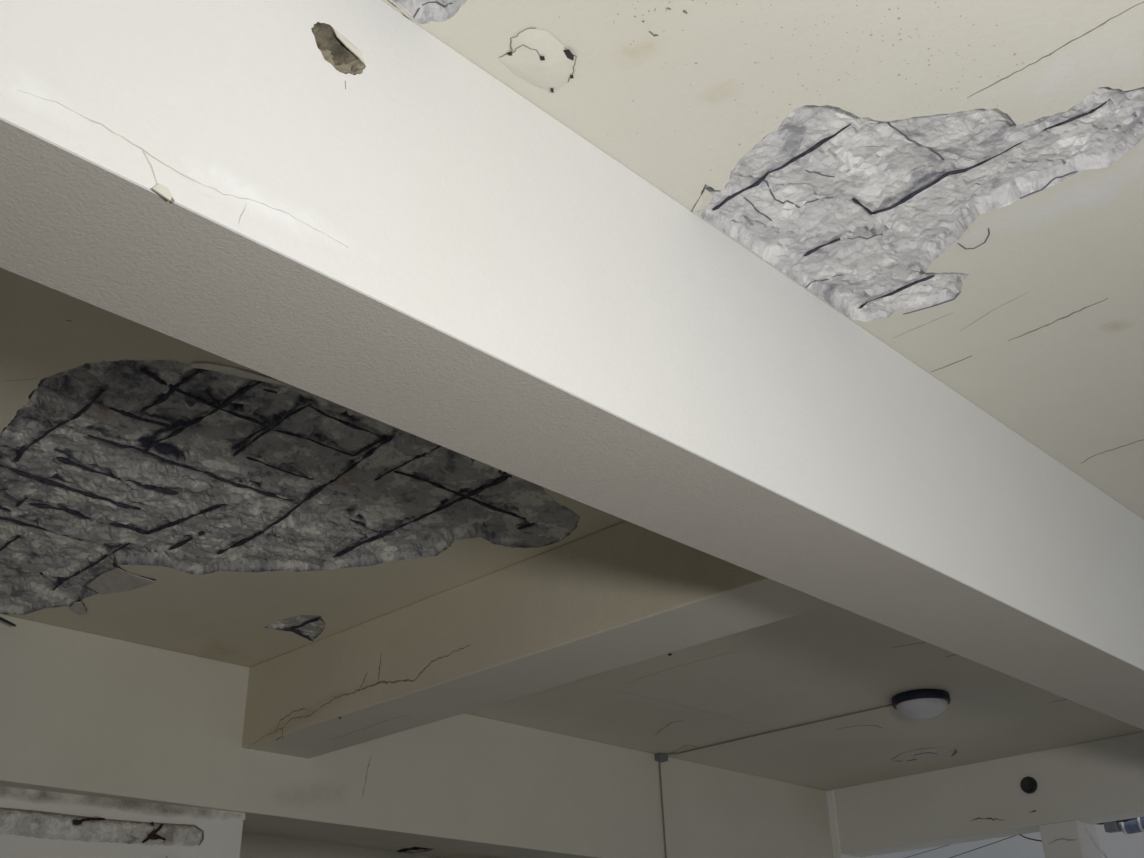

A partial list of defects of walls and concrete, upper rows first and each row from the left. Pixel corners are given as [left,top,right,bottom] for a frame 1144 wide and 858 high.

spalling [311,22,366,75]
spalling [387,0,467,24]
spalling [692,6,1144,322]
spalling [0,359,580,627]
spalling [263,615,326,641]
crack [253,645,470,744]